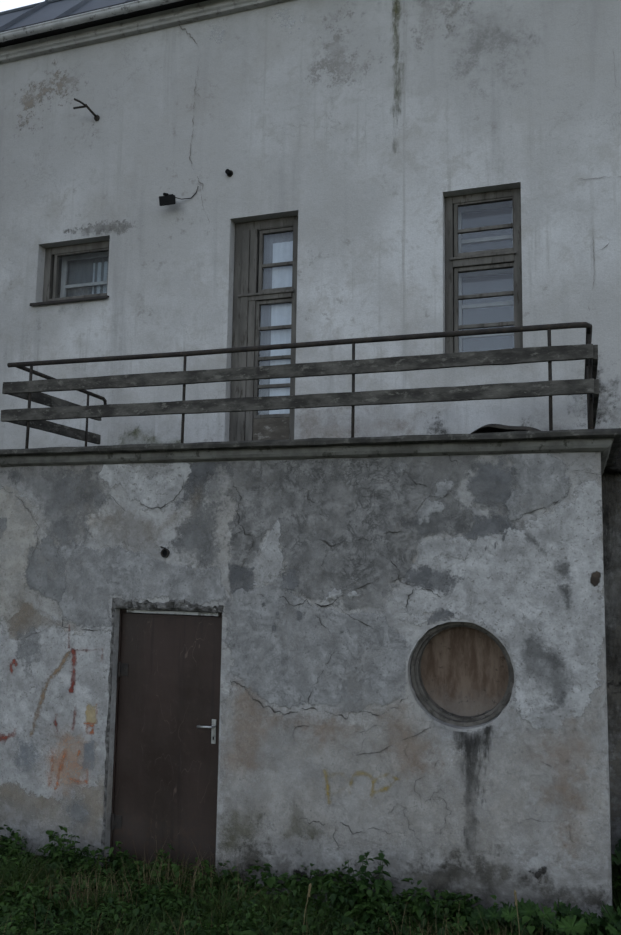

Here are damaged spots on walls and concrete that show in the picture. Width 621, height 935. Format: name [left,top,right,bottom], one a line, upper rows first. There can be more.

crack [260,560,440,628]
flaking render [229,457,476,610]
crack [319,531,400,566]
damp [601,471,621,839]
crack [230,649,456,849]
damp [460,726,490,788]